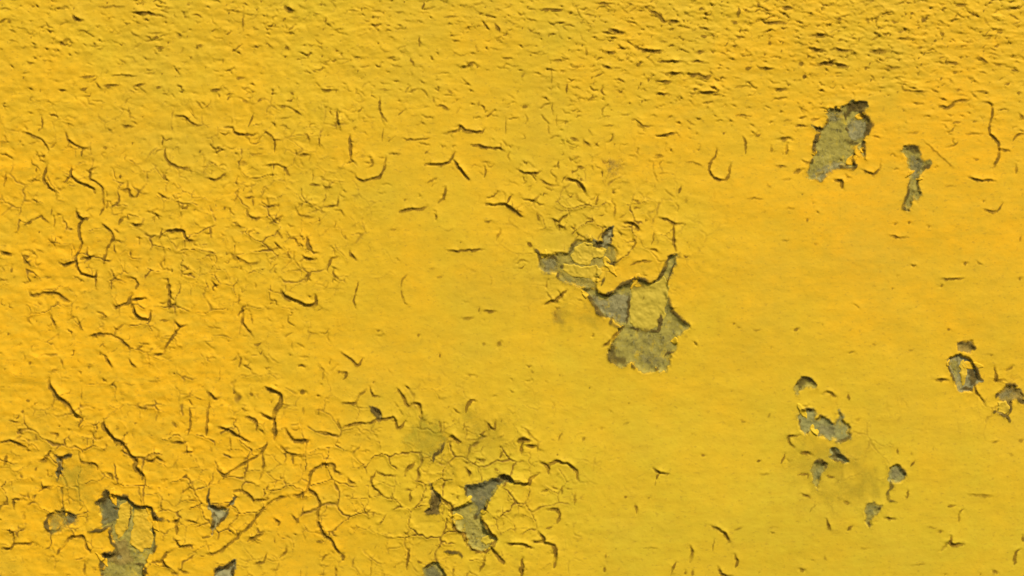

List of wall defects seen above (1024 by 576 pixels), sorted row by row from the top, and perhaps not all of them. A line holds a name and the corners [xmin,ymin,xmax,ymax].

crack [27,117,140,284]
crack [80,284,185,364]
crack [246,196,358,307]
crack [399,105,502,212]
peeling [527,226,689,373]
peeling [807,100,874,182]
peeling [946,341,984,392]
crack [2,355,421,570]
peeling [794,377,851,486]
peeling [90,487,170,576]
peeling [423,474,513,576]
crack [440,497,561,576]